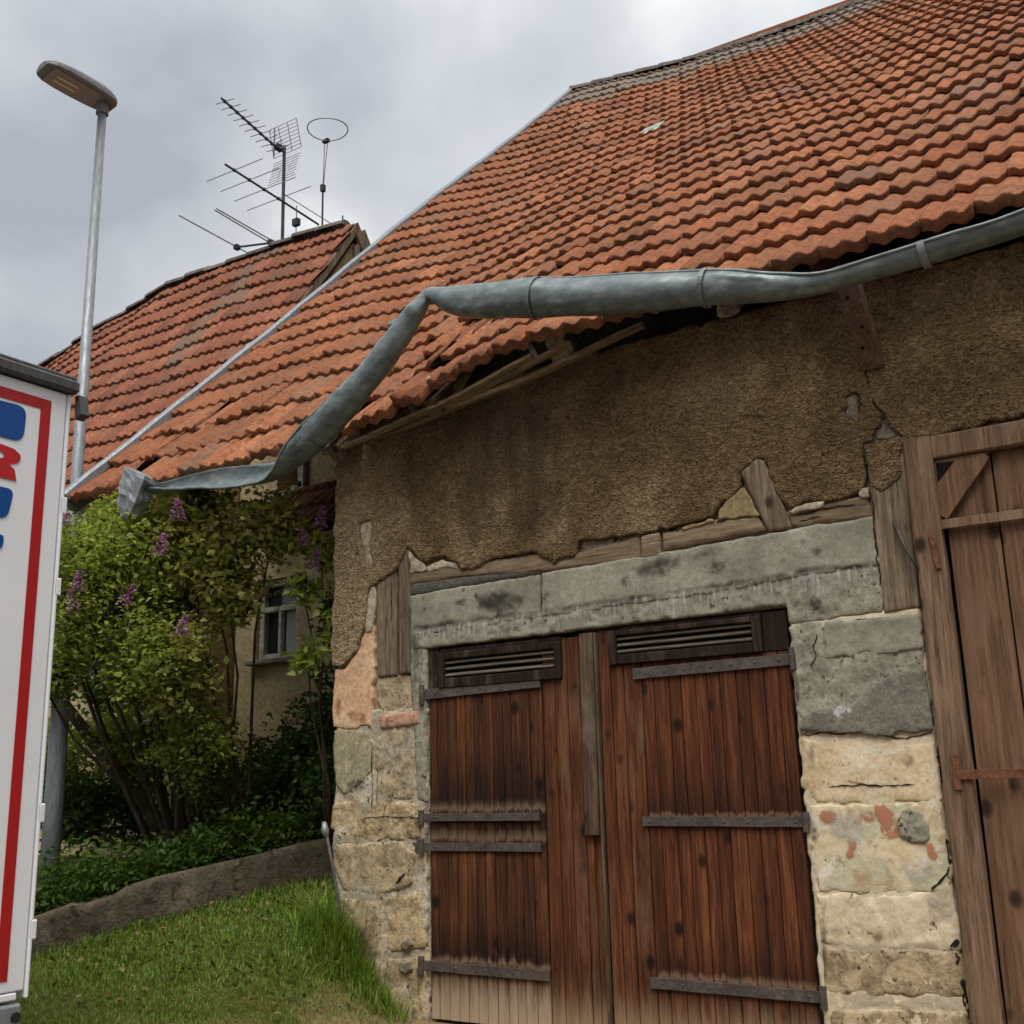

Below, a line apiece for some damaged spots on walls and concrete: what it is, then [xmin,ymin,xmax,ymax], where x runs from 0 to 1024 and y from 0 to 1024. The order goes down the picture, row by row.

crack [797,370,902,587]
peeling [682,487,761,530]
peeling [790,501,826,514]
peeling [356,521,372,566]
peeling [408,550,458,573]
peeling [365,586,377,633]
damp [419,588,535,640]
crack [803,731,943,784]
crack [831,779,913,787]